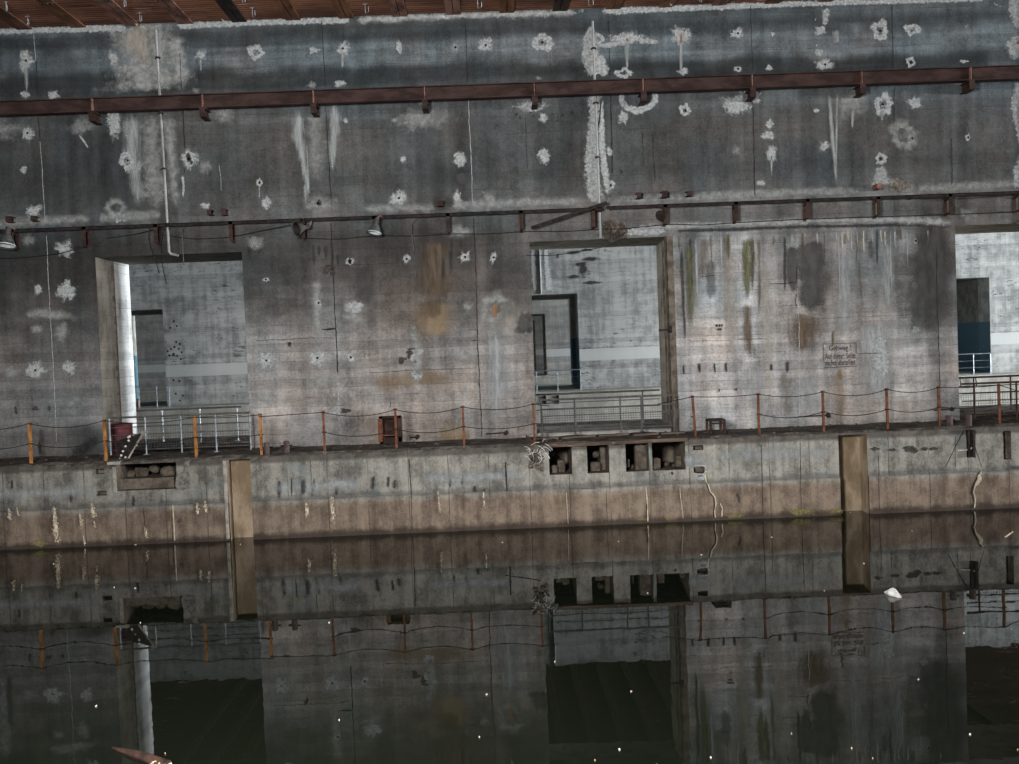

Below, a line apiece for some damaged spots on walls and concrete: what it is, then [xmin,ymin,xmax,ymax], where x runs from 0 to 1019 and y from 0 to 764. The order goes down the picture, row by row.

leakage [293,111,330,209]
leakage [627,216,950,349]
leakage [861,324,894,398]
crack [705,474,723,518]
crack [955,436,982,508]